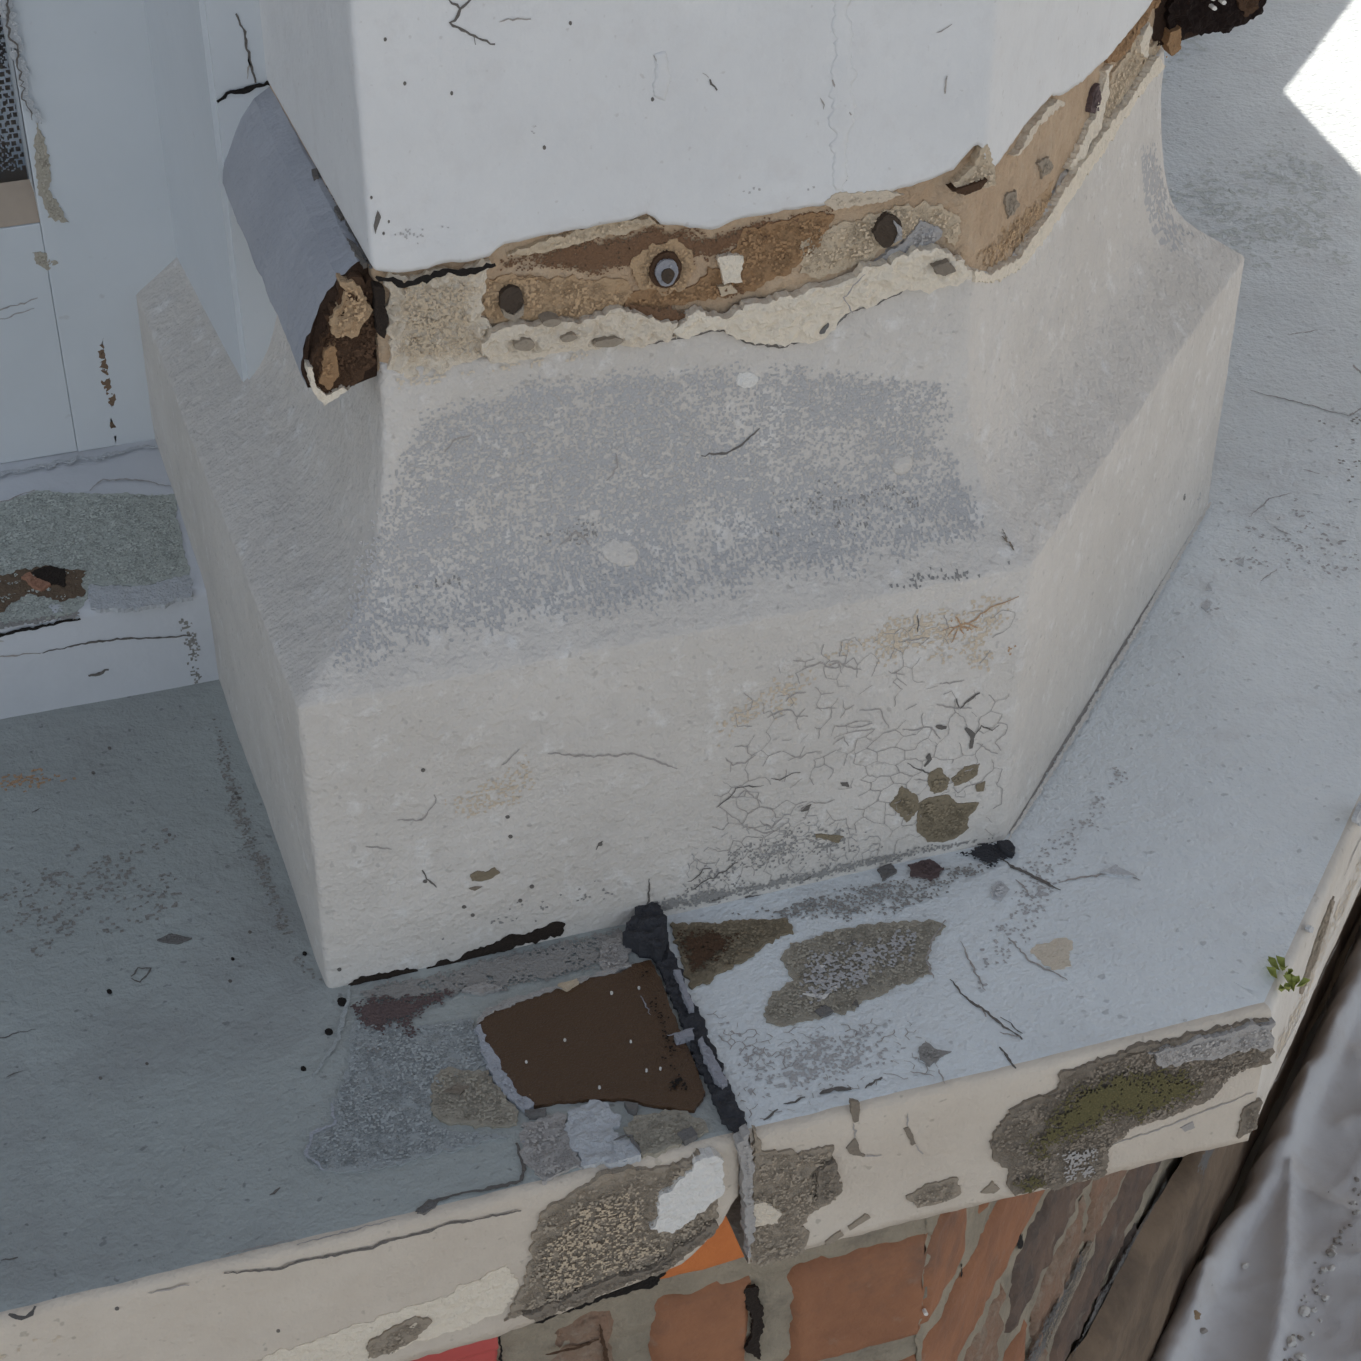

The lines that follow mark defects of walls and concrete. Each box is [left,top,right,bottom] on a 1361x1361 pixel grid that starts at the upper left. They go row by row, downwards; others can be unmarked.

crack [449,0,531,45]
spalling [370,196,390,235]
corrosion [624,211,835,322]
spalling [383,0,1165,379]
peeling [0,490,193,627]
crack [0,618,190,677]
crack [683,596,1140,904]
spalling [889,763,985,842]
spalling [670,918,794,990]
peeling [248,931,725,1361]
spalling [905,1177,962,1208]
spalling [981,1017,1276,1196]